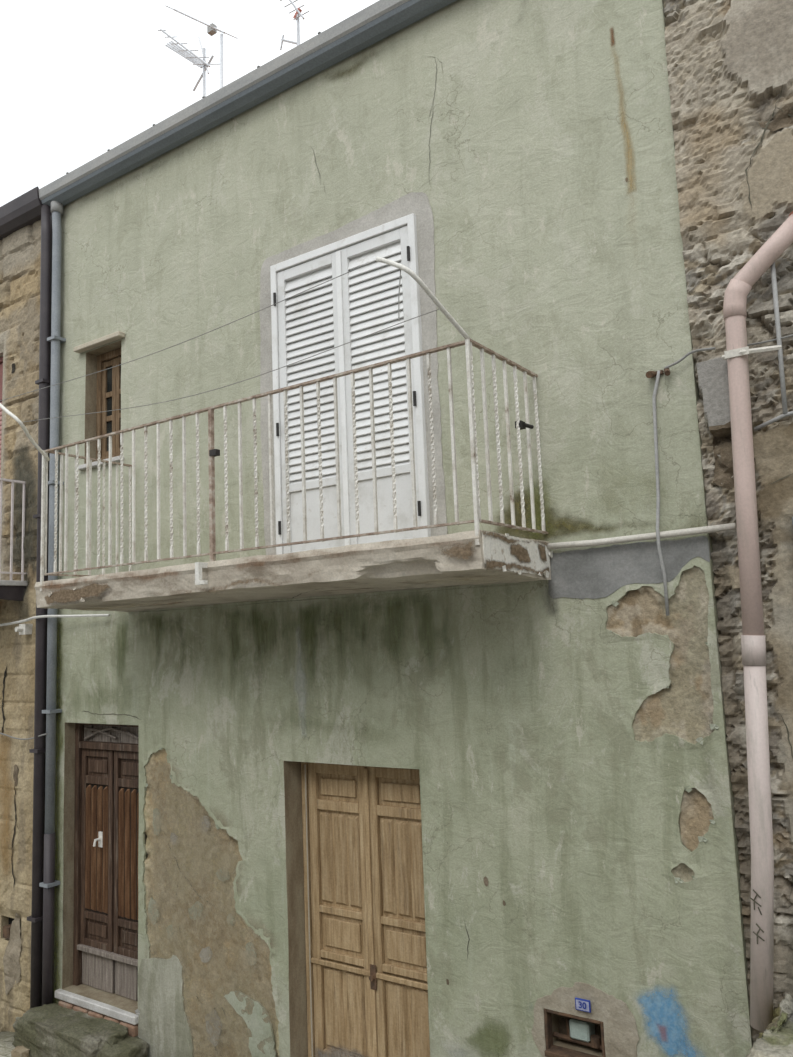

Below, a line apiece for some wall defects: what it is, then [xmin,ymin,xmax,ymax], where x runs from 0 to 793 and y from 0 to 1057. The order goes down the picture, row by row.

crack [428,57,443,187]
rust [621,101,633,190]
spalling [759,102,793,131]
peeling [442,531,553,578]
peeling [606,566,719,745]
crack [11,784,20,884]
peeling [144,747,280,1057]
peeling [672,863,698,883]
peeling [680,785,715,851]